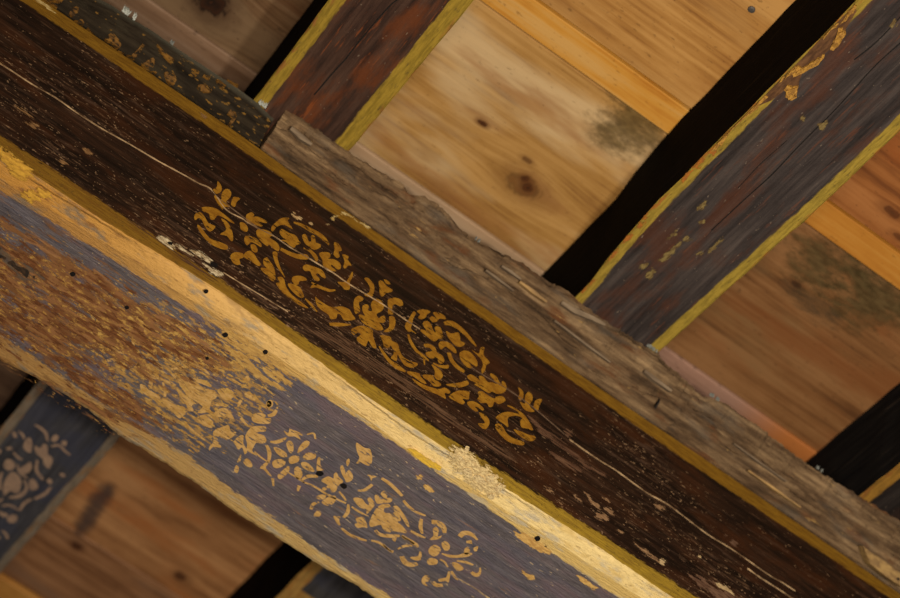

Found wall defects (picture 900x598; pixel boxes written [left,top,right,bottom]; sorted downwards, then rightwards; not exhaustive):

crack [314,0,397,95]
peeling [0,146,52,204]
crack [0,63,420,330]
leakage [597,102,662,153]
peeling [0,215,297,457]
spalling [407,444,506,500]
crack [471,367,795,598]
crack [448,572,489,598]